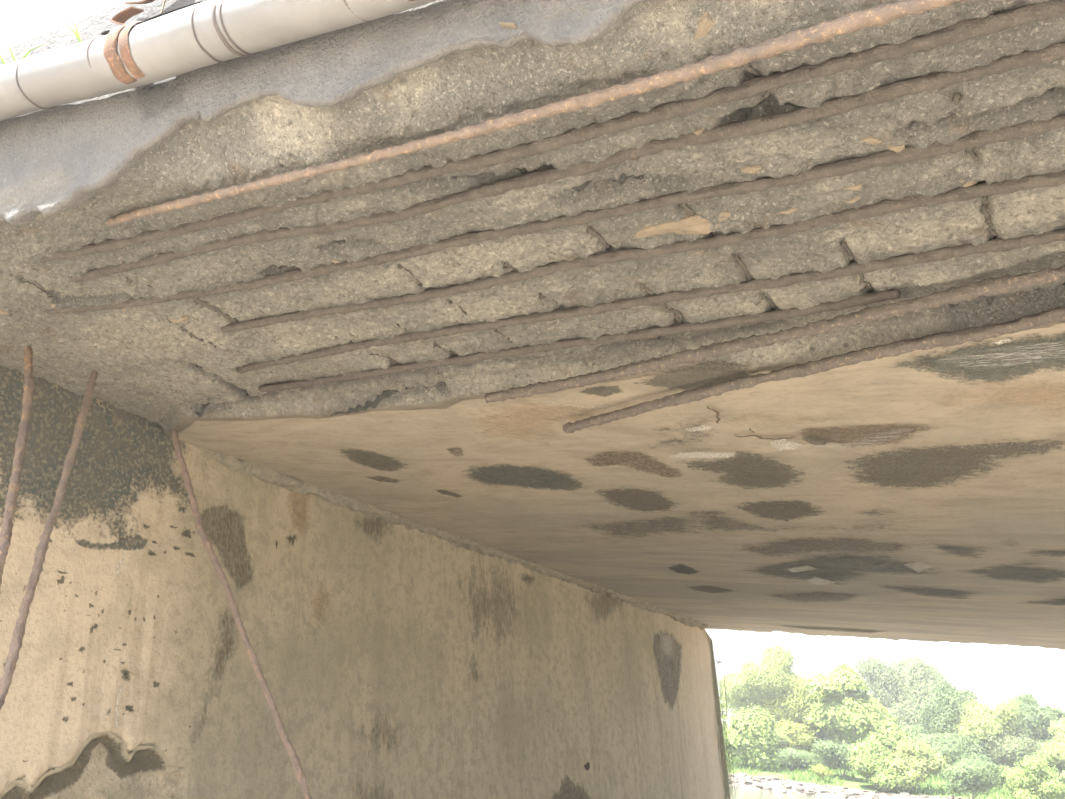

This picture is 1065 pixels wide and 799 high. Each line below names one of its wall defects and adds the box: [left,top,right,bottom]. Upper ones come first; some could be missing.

spalling [0,0,1065,438]
damp [0,366,196,575]
damp [340,449,407,483]
damp [463,464,584,491]
damp [586,424,1064,489]
damp [201,506,252,589]
damp [592,489,977,602]
damp [938,547,1065,583]
damp [788,626,884,634]
damp [653,631,682,708]